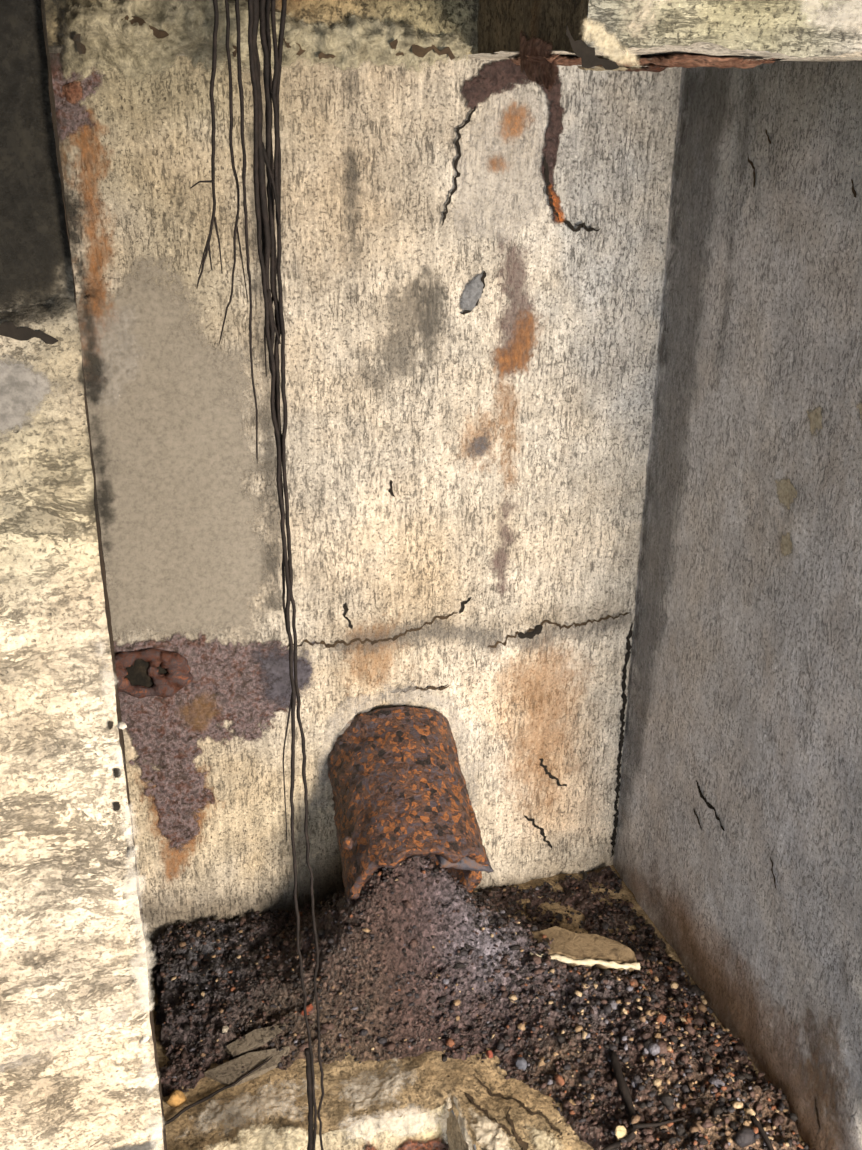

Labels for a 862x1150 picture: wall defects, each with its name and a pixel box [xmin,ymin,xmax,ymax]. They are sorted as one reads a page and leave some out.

corrosion [509,31,775,92]
corrosion [48,53,111,352]
corrosion [495,247,533,373]
crack [387,480,395,497]
corrosion [493,507,513,593]
crack [283,597,472,648]
crack [487,612,633,857]
corrosion [341,836,353,850]
corrosion [398,1139,449,1150]
spalling [441,1097,472,1150]